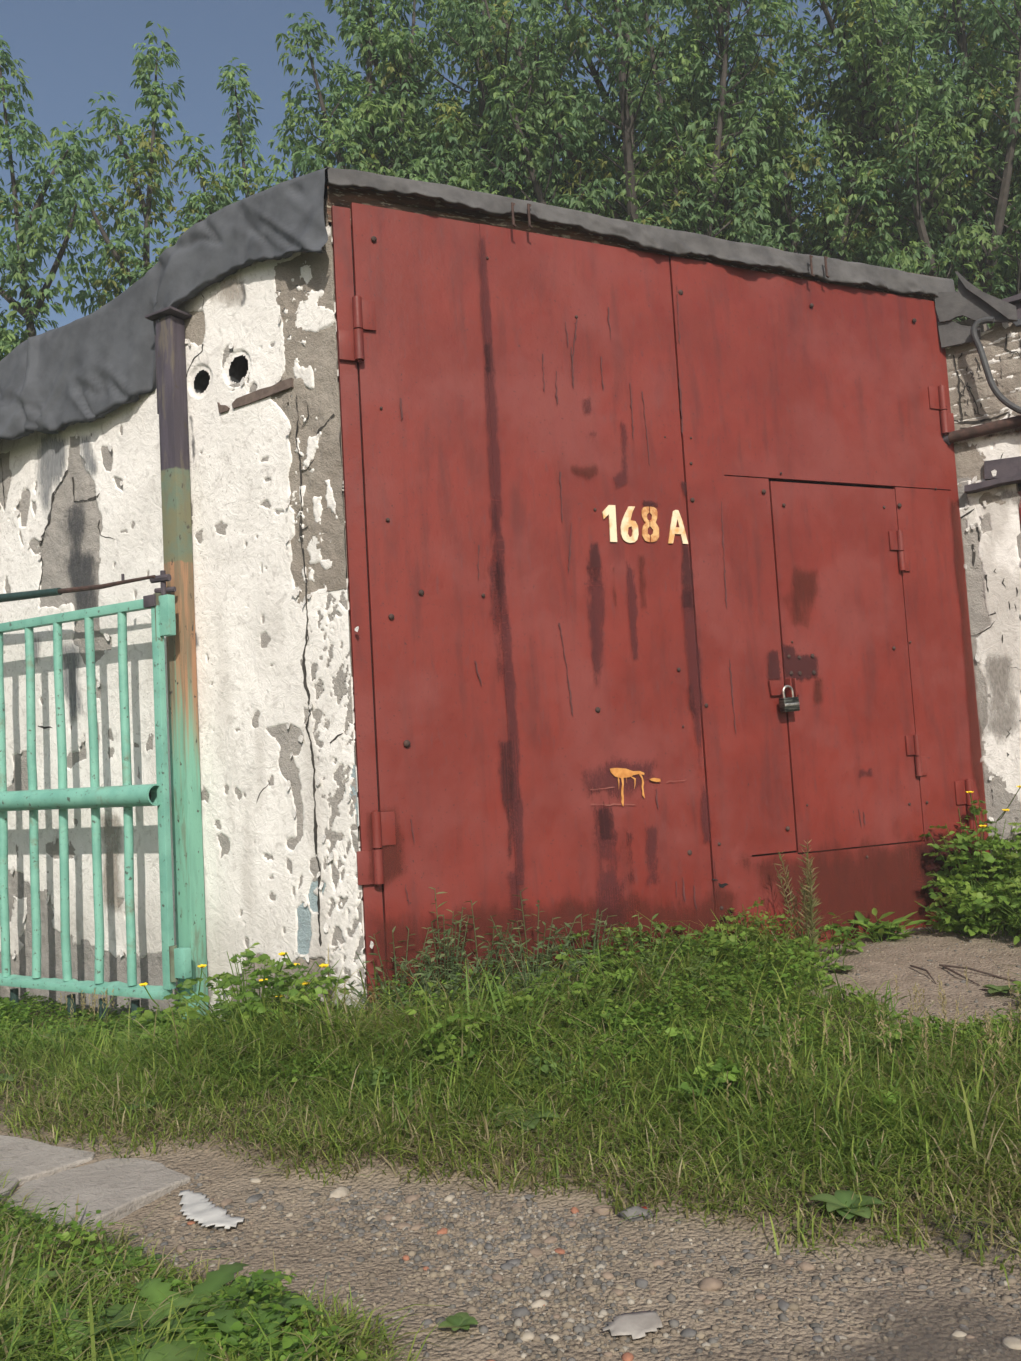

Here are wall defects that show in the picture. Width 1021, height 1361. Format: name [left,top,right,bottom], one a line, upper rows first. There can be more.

spalling [184,311,205,346]
spalling [7,750,28,791]
spalling [0,425,123,665]
spalling [46,819,78,873]
spalling [0,845,178,1026]
spalling [67,722,115,769]
flaking render [191,236,374,1022]
crack [295,395,343,947]
rust [373,842,409,904]
rust [379,241,732,979]
rust [768,645,821,701]
flaking render [945,322,1021,875]